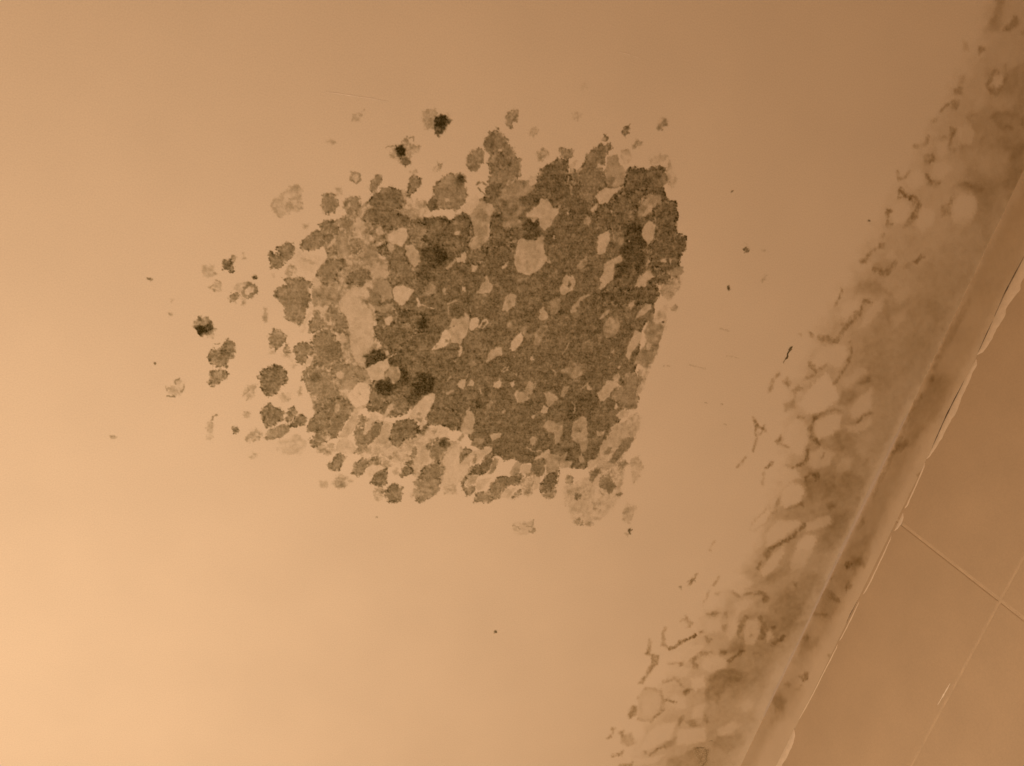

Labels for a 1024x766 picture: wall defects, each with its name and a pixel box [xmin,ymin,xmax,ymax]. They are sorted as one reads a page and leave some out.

mould [434,114,450,136]
mould [195,317,213,336]
mould [260,132,687,503]